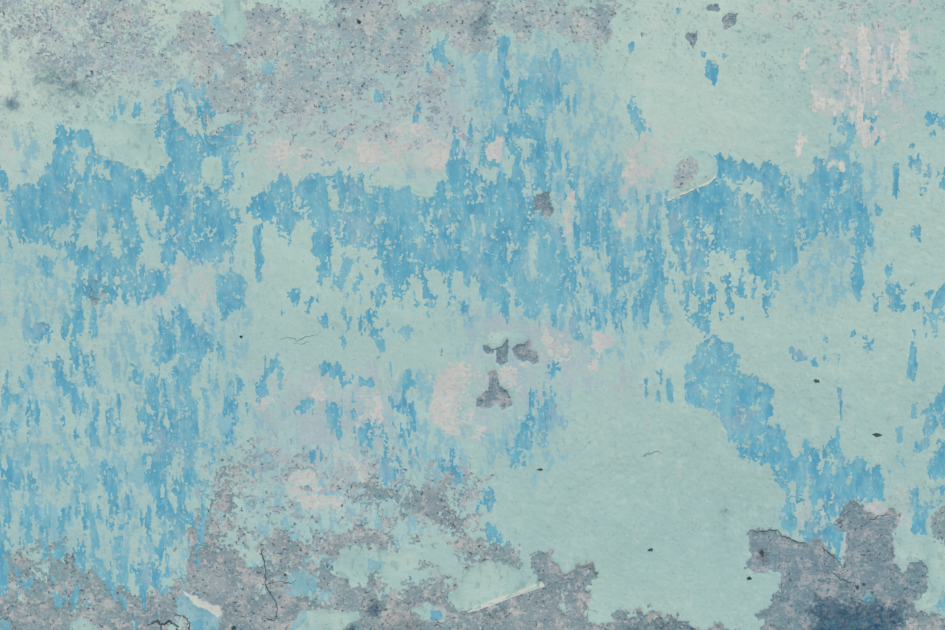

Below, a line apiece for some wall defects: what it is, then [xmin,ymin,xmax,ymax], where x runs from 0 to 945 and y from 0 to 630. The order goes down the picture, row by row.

flaking render [706,3,738,29]
peeling [0,0,156,93]
peeling [685,31,729,87]
peeling [627,95,652,141]
peeling [924,111,945,138]
peeling [0,166,9,192]
peeling [892,143,945,200]
peeling [585,283,615,372]
peeling [872,262,945,382]
flaking render [0,302,699,630]
crack [260,550,294,621]
crack [147,614,190,630]